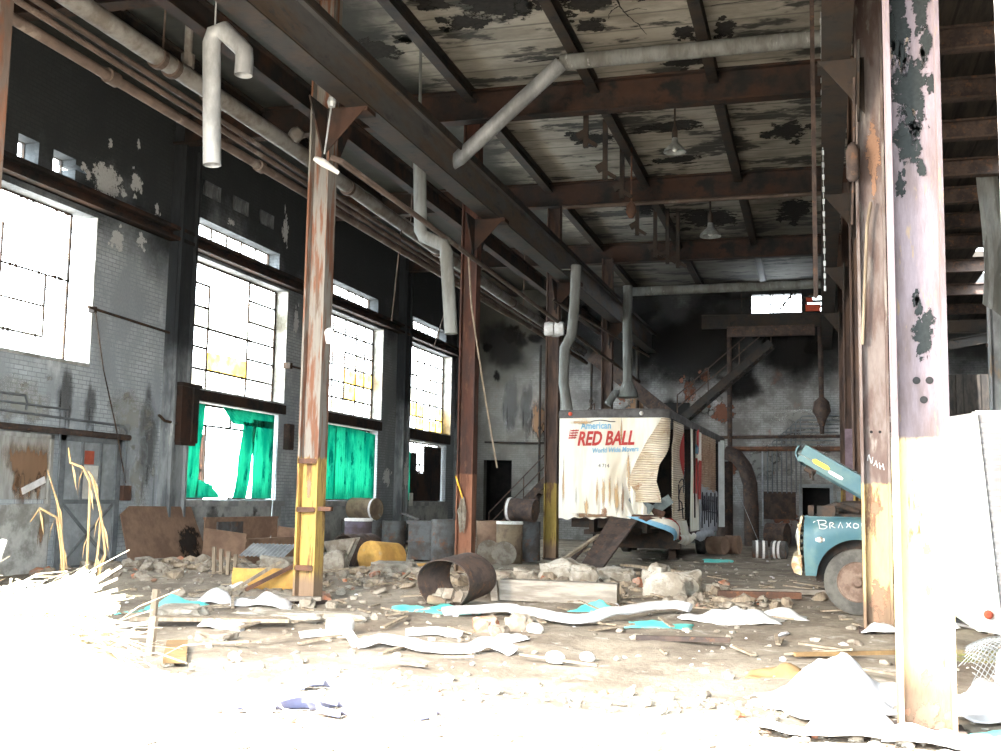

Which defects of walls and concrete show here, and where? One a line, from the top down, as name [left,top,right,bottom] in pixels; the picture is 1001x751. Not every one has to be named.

peeling [410,0,543,33]
peeling [558,0,617,32]
peeling [672,25,697,41]
peeling [713,15,737,39]
peeling [660,58,704,71]
peeling [889,0,934,198]
peeling [627,120,704,134]
peeling [643,155,702,166]
rust [864,119,881,199]
peeling [81,161,143,199]
peeling [911,289,936,361]
rust [869,579,887,623]